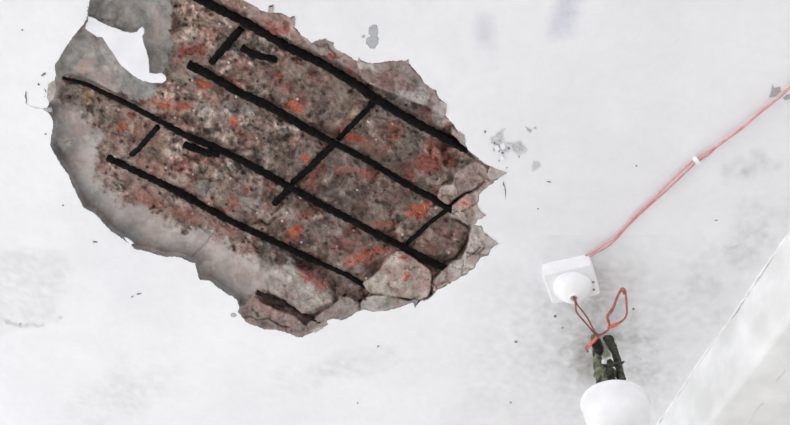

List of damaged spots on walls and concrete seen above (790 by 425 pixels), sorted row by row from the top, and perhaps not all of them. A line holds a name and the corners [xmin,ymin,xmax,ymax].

spalling [25,0,510,337]